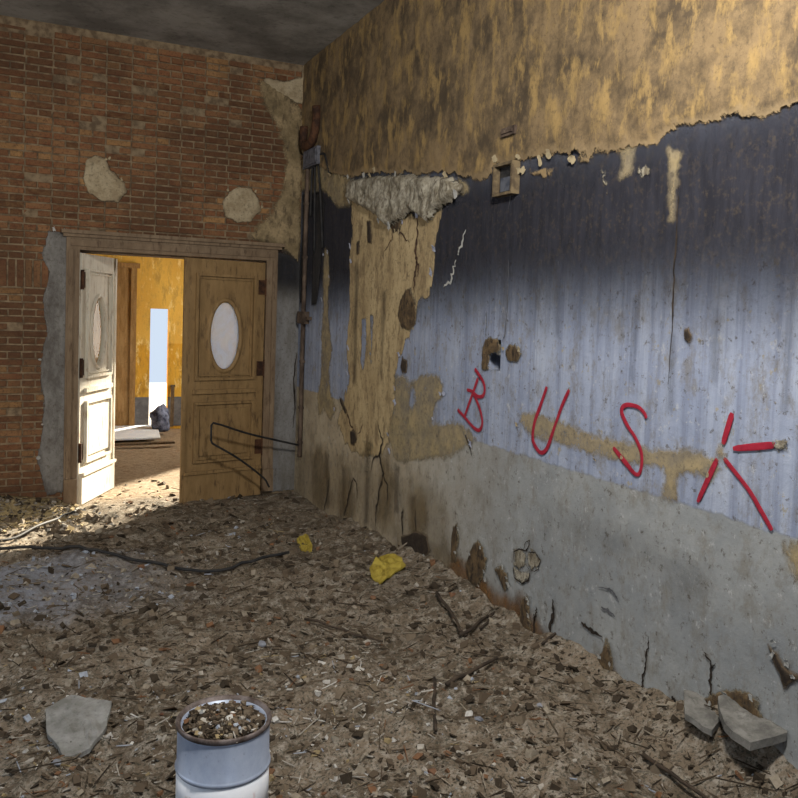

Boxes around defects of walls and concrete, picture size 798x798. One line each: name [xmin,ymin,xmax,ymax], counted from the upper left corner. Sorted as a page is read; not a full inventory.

flaking render [301,0,798,463]
peeling [515,413,724,501]
spalling [450,523,459,563]
corrosion [449,559,521,617]
spalling [466,540,541,592]
spalling [519,596,531,631]
spalling [768,639,798,689]